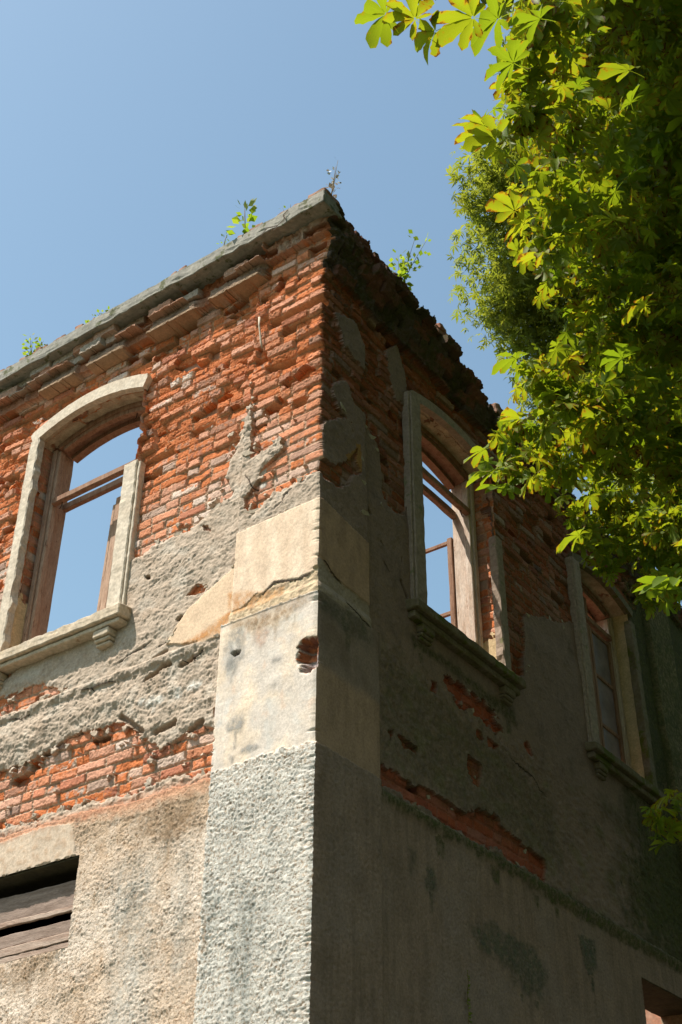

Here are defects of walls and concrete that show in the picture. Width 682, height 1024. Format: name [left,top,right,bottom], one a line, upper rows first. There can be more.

spalling [0,229,593,838]
crack [244,560,371,628]
spalling [380,763,547,882]